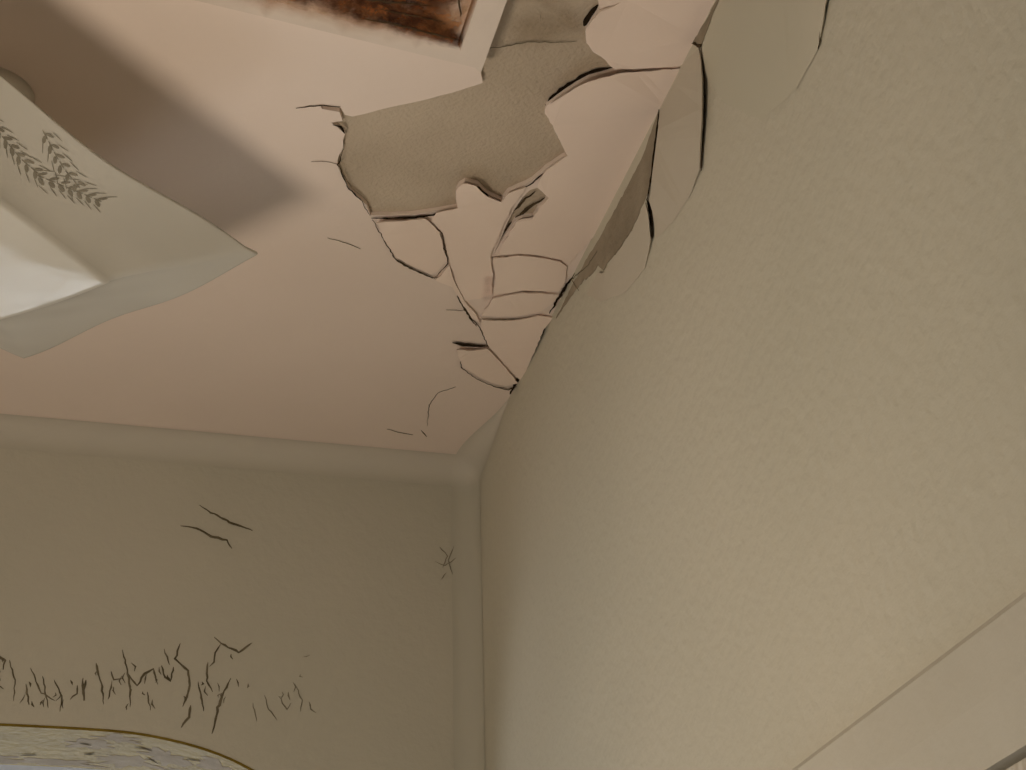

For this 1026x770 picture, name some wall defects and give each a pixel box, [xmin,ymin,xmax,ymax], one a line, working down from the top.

rust [268,0,463,46]
crack [296,105,448,279]
crack [500,174,545,257]
peeling [336,0,827,386]
crack [536,253,596,348]
crack [387,296,519,437]
crack [183,505,253,548]
crack [0,637,316,733]